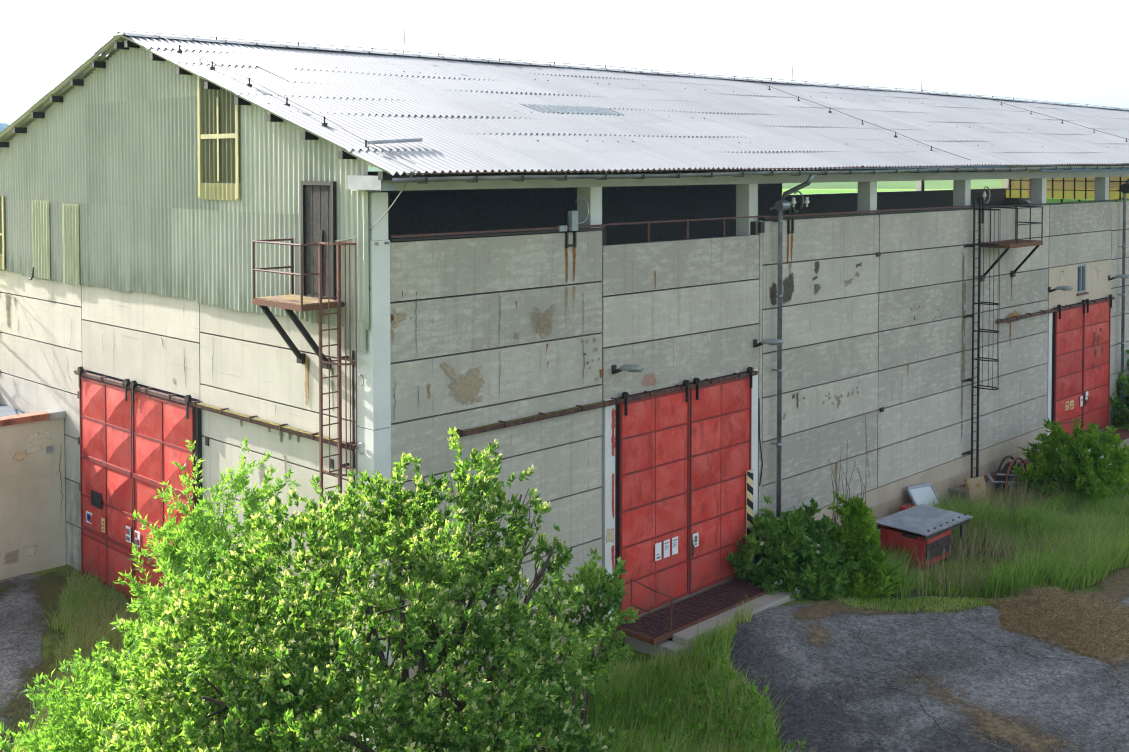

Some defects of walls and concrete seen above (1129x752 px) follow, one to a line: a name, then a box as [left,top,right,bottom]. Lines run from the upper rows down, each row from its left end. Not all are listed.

corrosion [565,246,576,311]
water stain [770,273,794,305]
peeling [441,363,485,403]